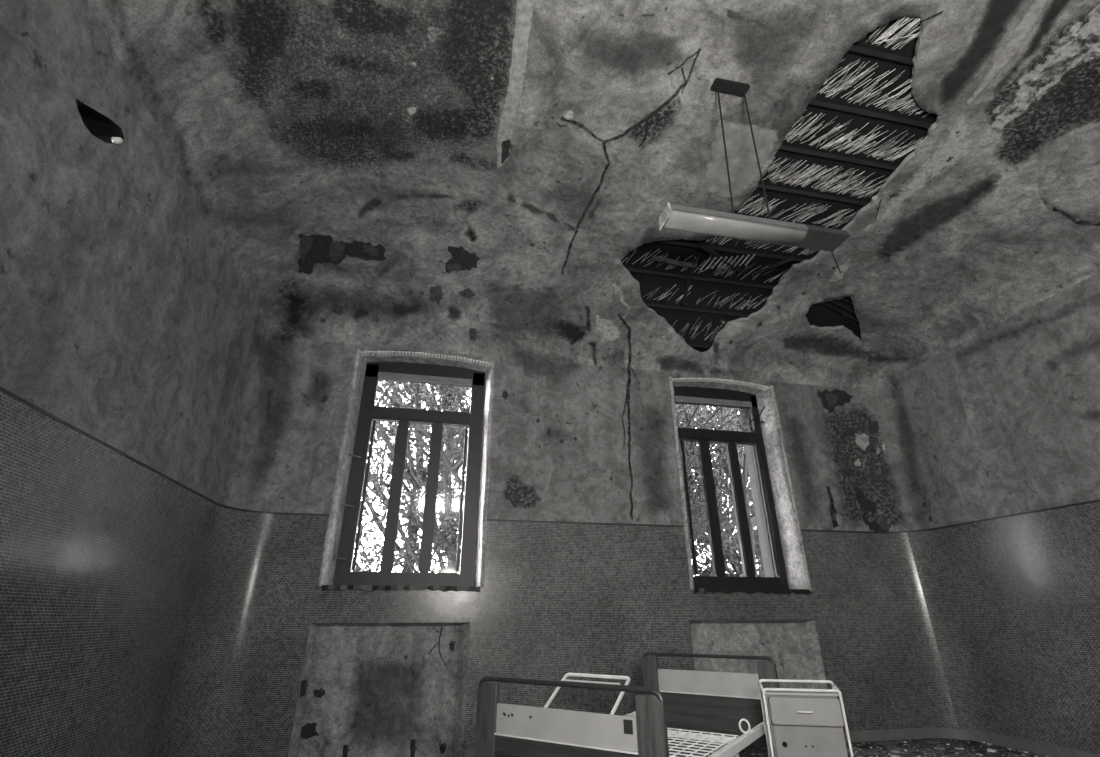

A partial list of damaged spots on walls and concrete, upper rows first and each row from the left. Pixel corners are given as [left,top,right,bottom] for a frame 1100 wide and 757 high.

leakage [201,0,513,169]
peeling [986,2,1100,134]
spalling [75,99,125,144]
crack [561,48,701,275]
peeling [864,116,972,232]
spalling [297,233,386,274]
peeling [408,286,443,305]
spalling [445,246,480,273]
peeling [459,289,476,299]
peeling [817,259,850,285]
crack [618,314,640,520]